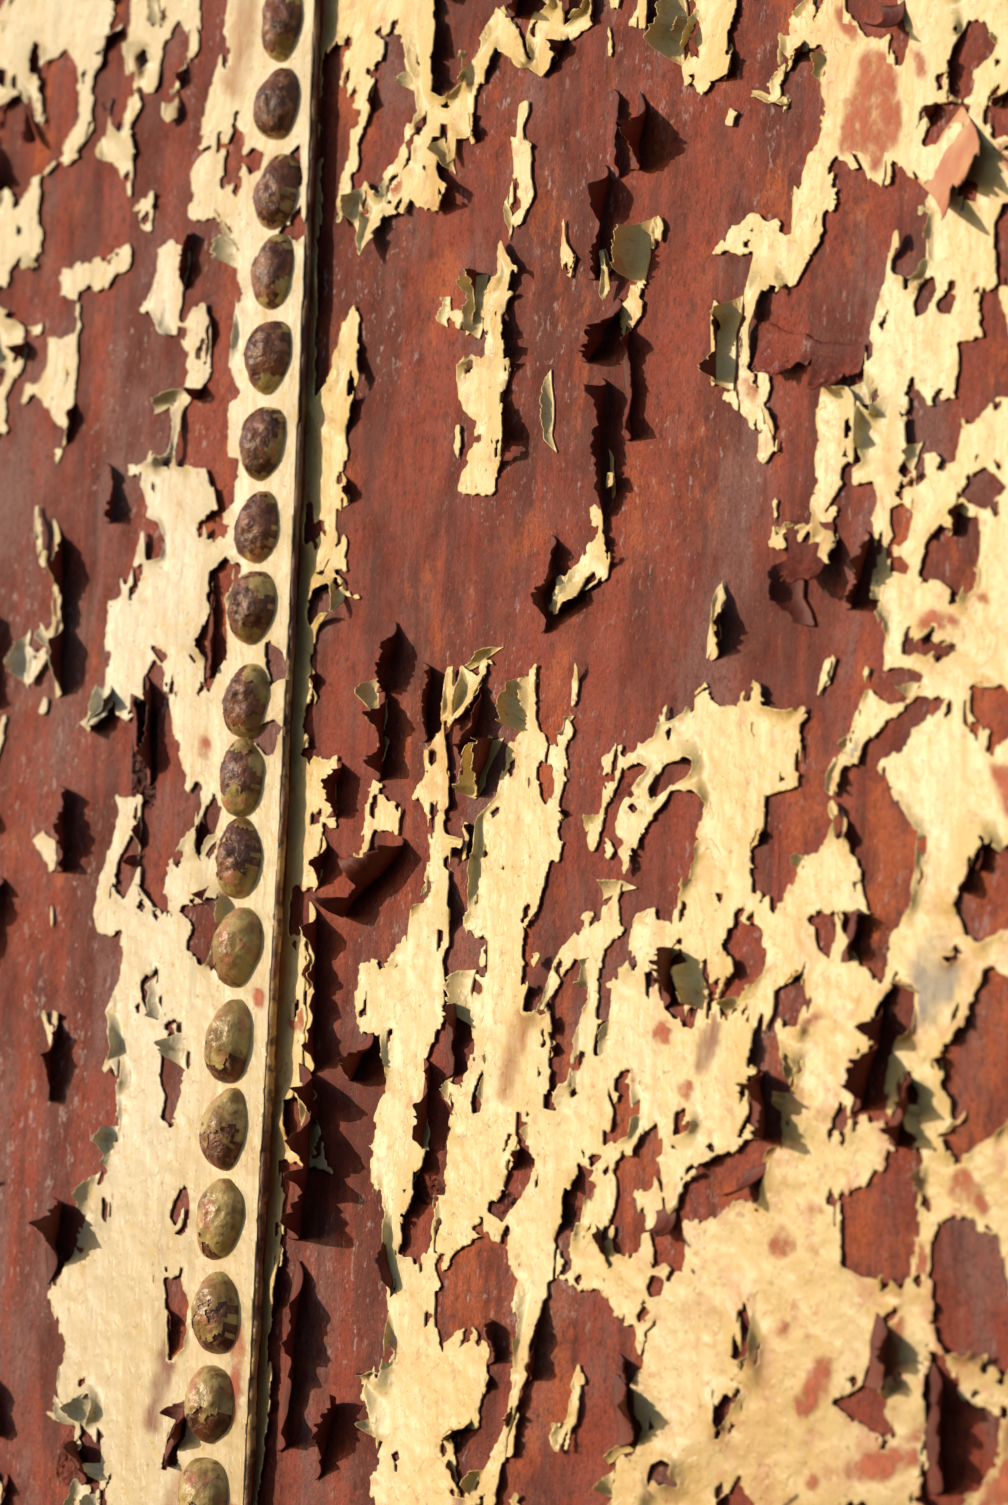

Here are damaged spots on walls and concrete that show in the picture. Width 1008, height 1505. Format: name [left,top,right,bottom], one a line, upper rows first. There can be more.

peeling [836,8,857,39]
peeling [840,53,901,170]
peeling [919,610,956,629]
rust [0,0,264,1505]
rust [251,720,282,756]
rust [257,0,1008,1505]
peeling [991,766,1008,814]
peeling [653,1022,671,1043]
peeling [950,1169,987,1214]
peeling [796,1360,830,1417]
peeling [854,1431,921,1480]
peeling [980,1458,1008,1505]